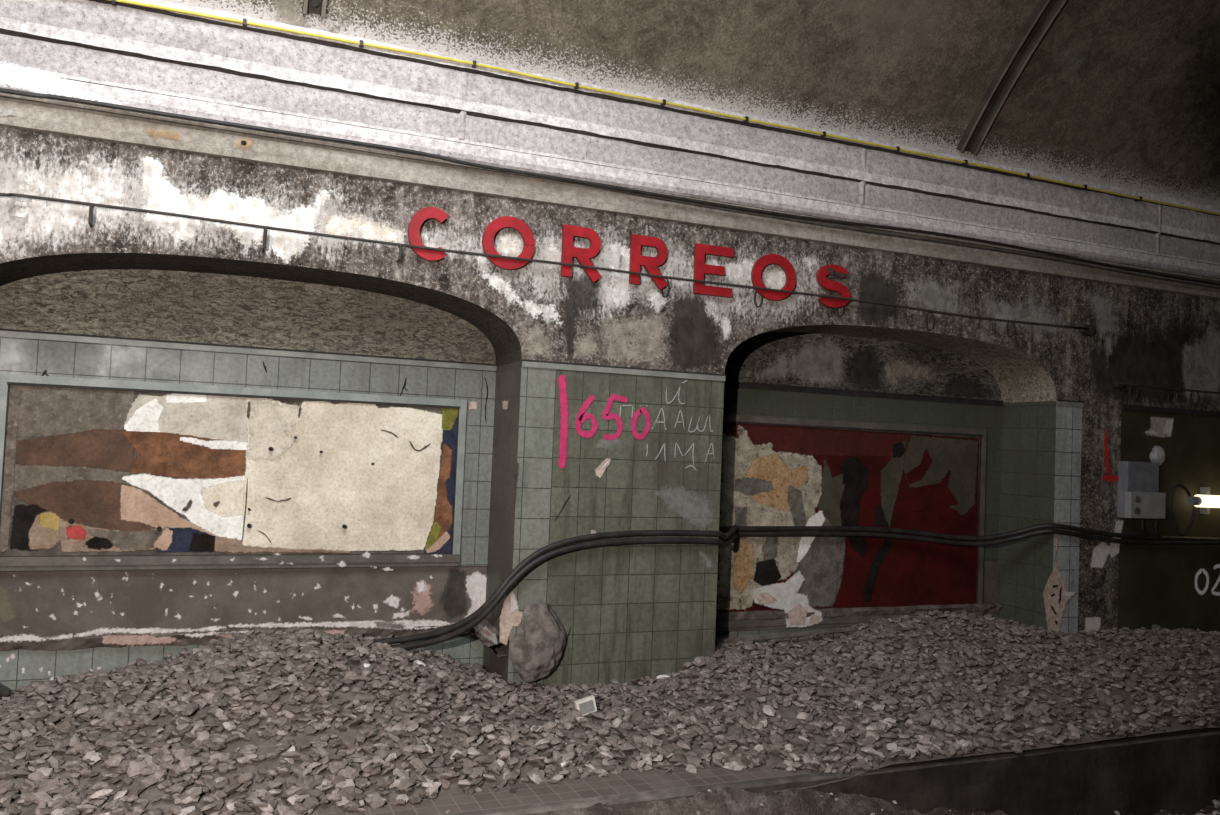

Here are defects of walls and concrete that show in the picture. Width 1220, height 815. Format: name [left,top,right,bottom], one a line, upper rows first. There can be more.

leakage [0,139,821,369]
leakage [857,272,961,325]
leakage [748,338,992,397]
peeling [0,572,523,680]
spalling [1043,518,1075,632]
peeling [1084,617,1101,633]